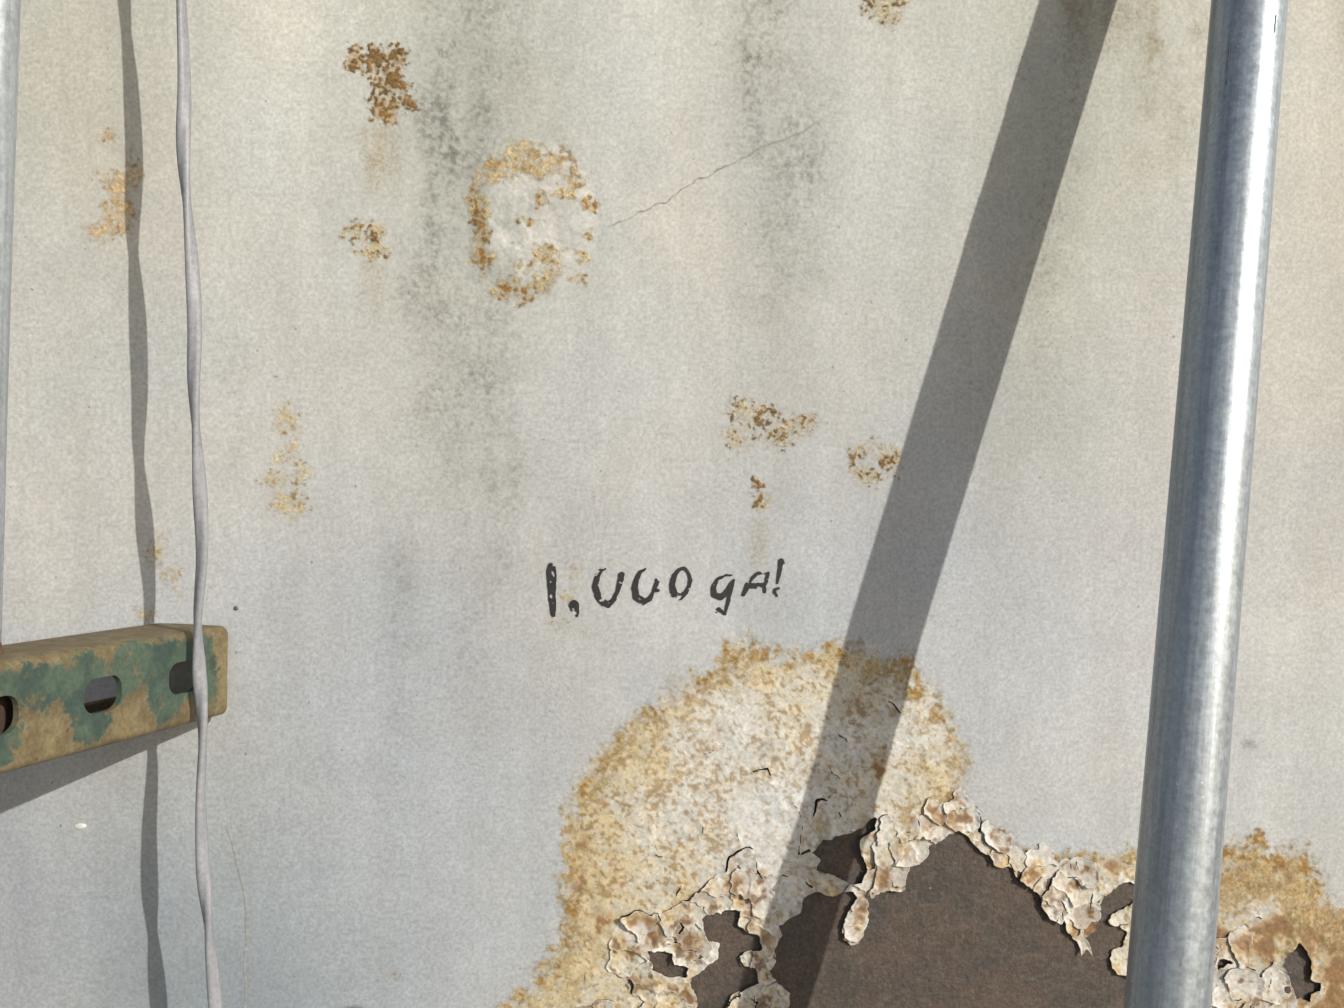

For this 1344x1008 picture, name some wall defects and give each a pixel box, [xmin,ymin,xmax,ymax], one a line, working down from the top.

corrosion [860,0,907,24]
corrosion [343,42,419,124]
corrosion [89,164,143,237]
corrosion [339,218,391,262]
corrosion [463,140,599,307]
crack [606,115,828,227]
corrosion [726,395,816,451]
corrosion [751,476,769,510]
corrosion [849,437,900,487]
peeling [459,620,1139,1008]
peeling [1211,813,1344,1008]